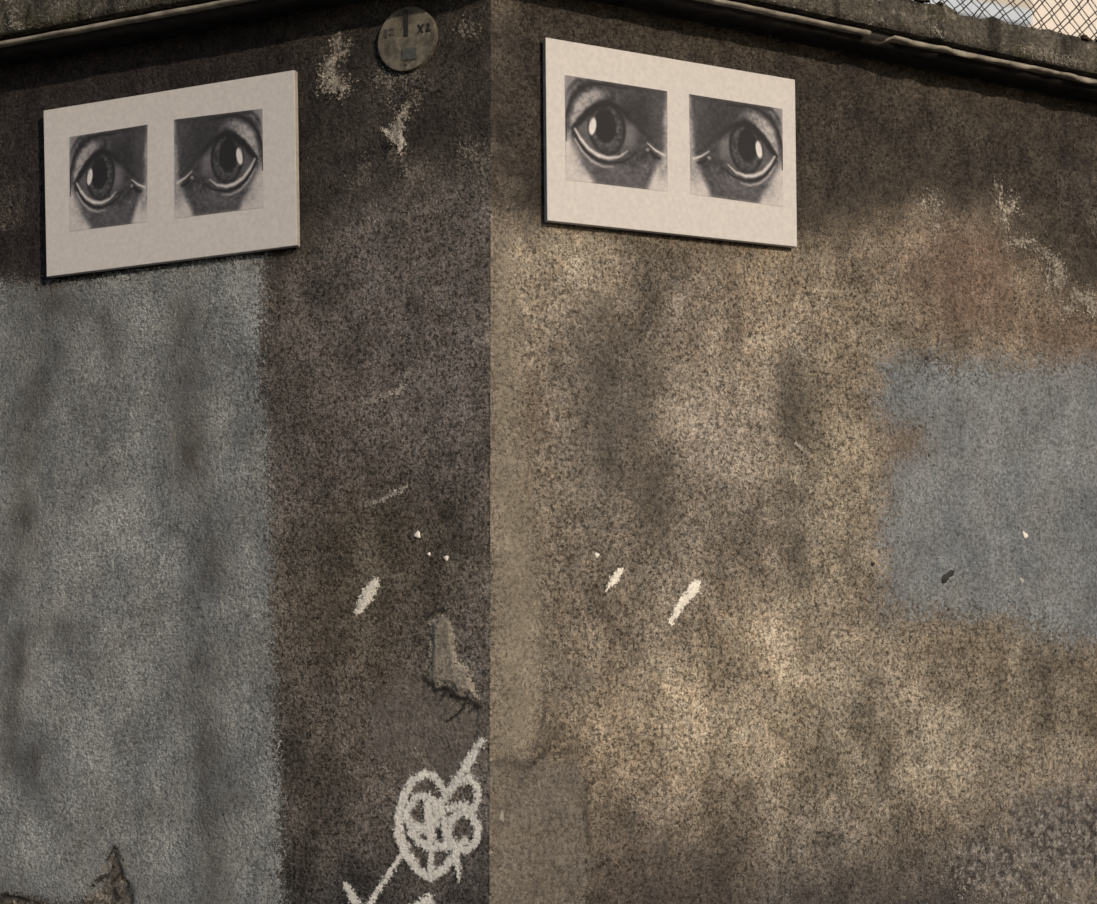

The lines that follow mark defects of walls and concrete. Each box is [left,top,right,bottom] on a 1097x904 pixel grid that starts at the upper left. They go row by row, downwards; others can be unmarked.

water stain [0,0,1097,332]
flaking render [359,607,489,793]
flaking render [0,890,46,904]
flaking render [84,845,136,904]